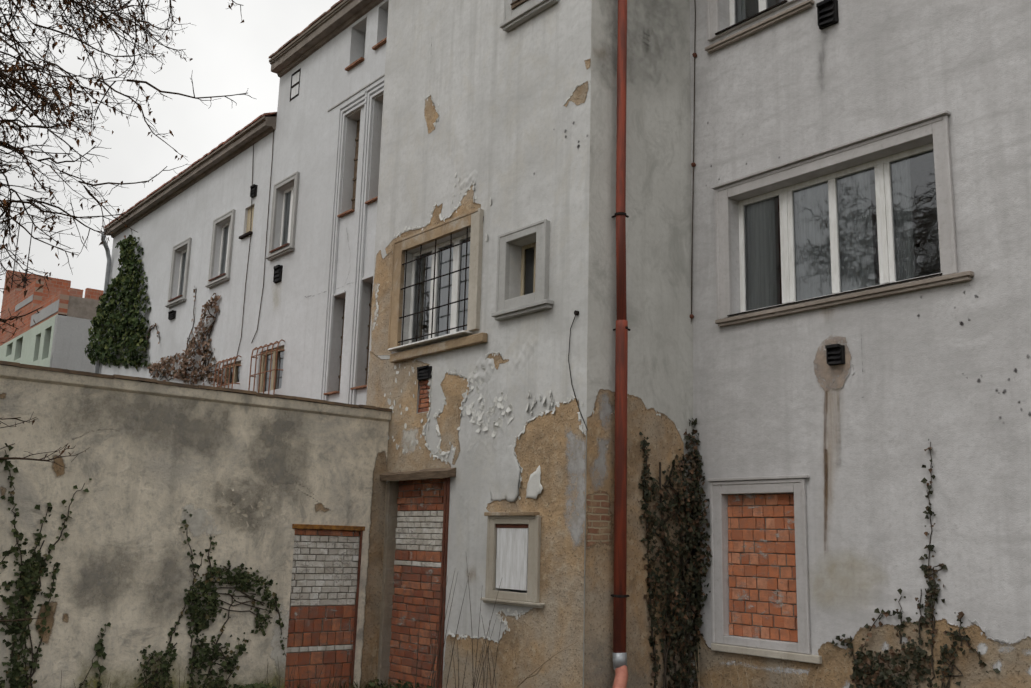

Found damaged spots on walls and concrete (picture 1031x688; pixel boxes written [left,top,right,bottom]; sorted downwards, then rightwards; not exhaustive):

spalling [563,58,591,107]
spalling [424,94,440,134]
flaking render [485,351,509,369]
leakage [107,395,229,451]
flaking render [360,173,481,688]
spalling [52,455,65,477]
flaking render [442,388,1031,688]
spalling [35,601,69,643]